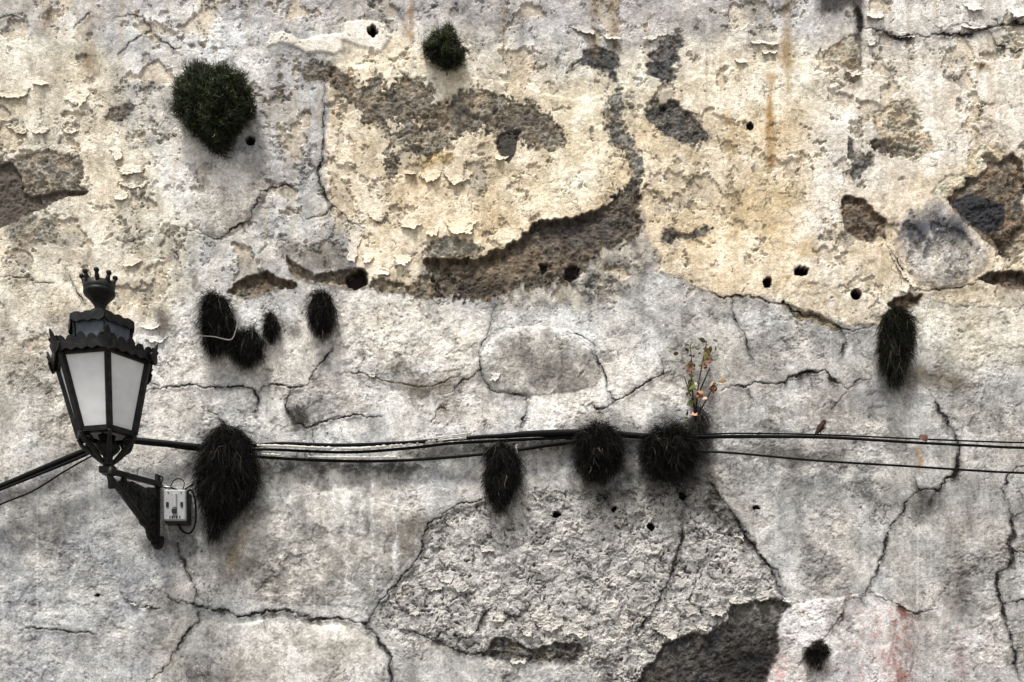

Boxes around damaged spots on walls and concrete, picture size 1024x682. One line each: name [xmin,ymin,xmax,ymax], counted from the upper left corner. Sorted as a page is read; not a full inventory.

spalling [0,150,88,247]
spalling [227,23,648,305]
spalling [646,99,707,144]
rust [766,73,774,166]
spalling [841,195,923,310]
spalling [931,142,1024,289]
crack [151,307,528,442]
crack [707,287,868,408]
crack [121,497,515,682]
spalling [366,485,792,682]
crack [799,389,961,666]
crack [995,466,1024,673]